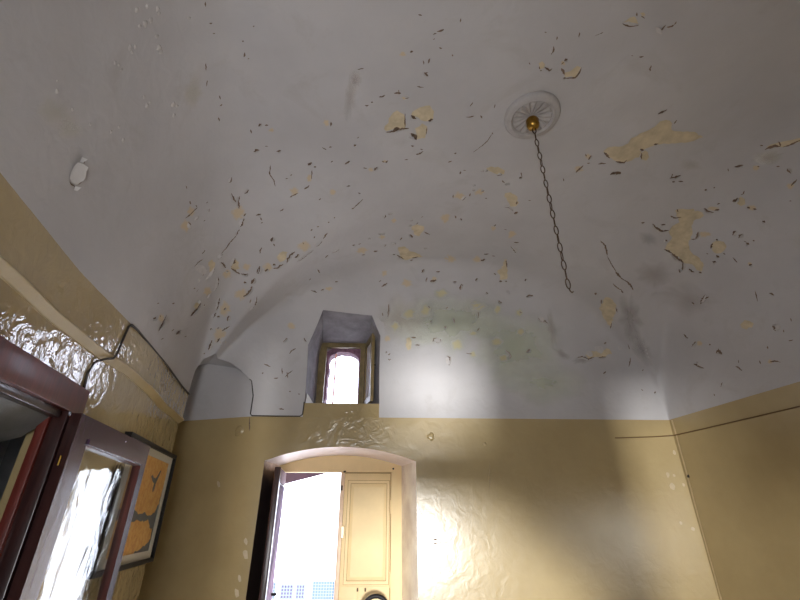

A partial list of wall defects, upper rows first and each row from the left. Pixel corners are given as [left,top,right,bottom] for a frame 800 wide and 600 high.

peeling [384,105,434,160]
peeling [572,110,702,176]
peeling [195,226,327,311]
peeling [641,203,753,274]